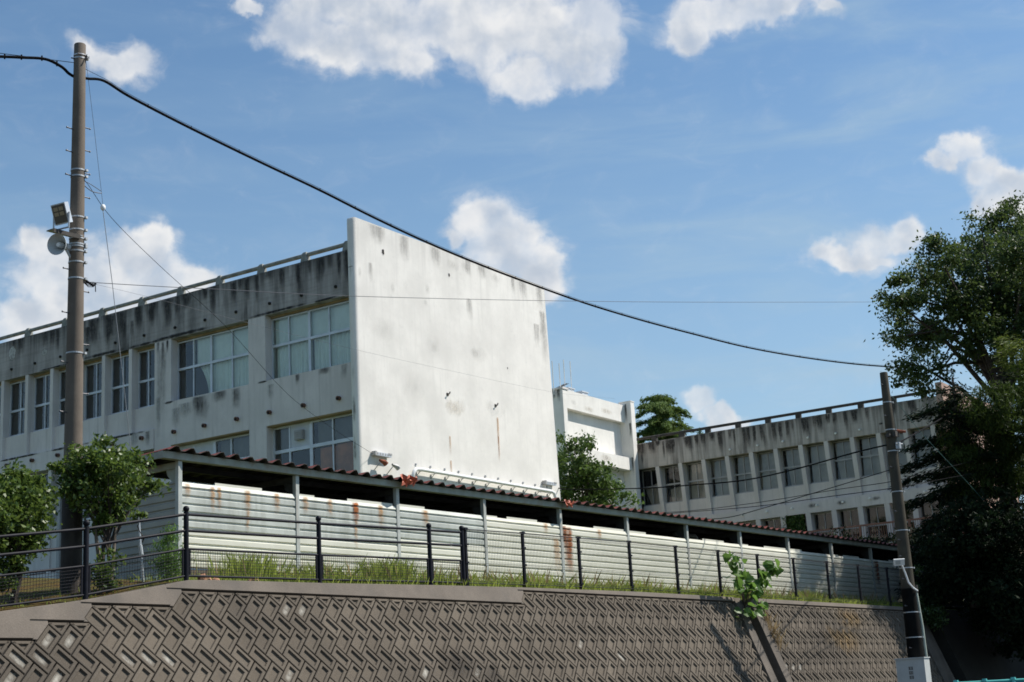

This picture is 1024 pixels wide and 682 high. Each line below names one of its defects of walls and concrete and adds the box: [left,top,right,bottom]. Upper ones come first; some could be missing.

damp [231,265,300,294]
damp [319,252,348,272]
damp [86,294,190,340]
damp [131,328,204,364]
damp [632,408,868,467]
corrosion [557,526,572,562]